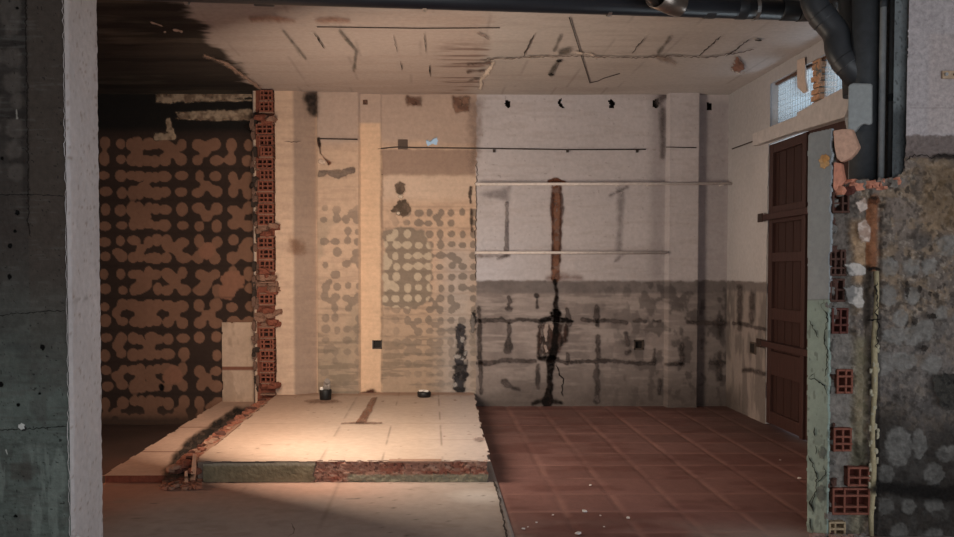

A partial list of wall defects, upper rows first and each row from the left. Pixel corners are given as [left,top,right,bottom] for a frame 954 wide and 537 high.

rust [548,178,566,282]
spalling [819,129,880,241]
peeling [829,249,880,334]
leakage [532,279,573,406]
crack [808,303,829,394]
spalling [834,369,854,394]
crack [808,427,827,529]
spalling [819,427,853,458]
spalling [816,465,871,535]